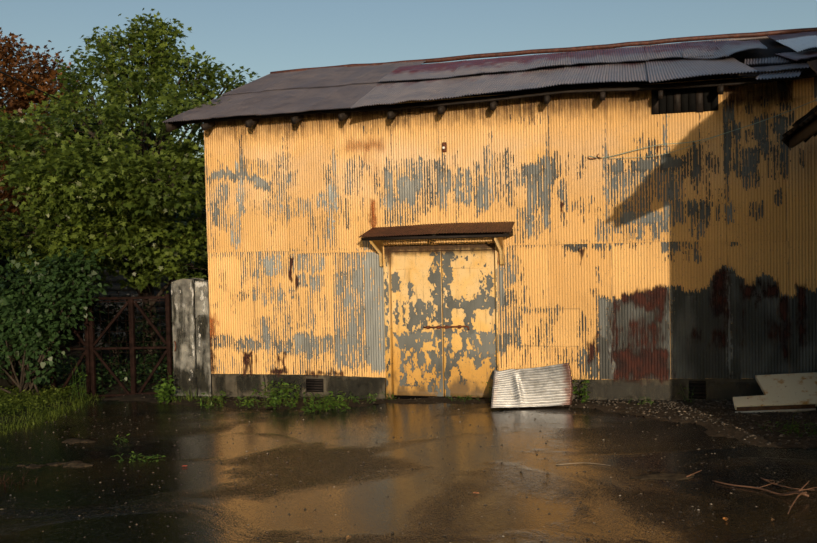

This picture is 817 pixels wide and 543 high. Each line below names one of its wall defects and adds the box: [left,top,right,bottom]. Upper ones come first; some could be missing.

peeling [205,99,817,397]
leakage [171,292,208,356]
peeling [171,281,218,357]
leakage [173,350,226,394]
rust [243,351,257,376]
leakage [237,374,306,397]
rust [270,352,287,377]
rust [587,332,598,363]
rust [610,286,676,383]
rust [709,268,729,348]
rust [740,278,807,363]